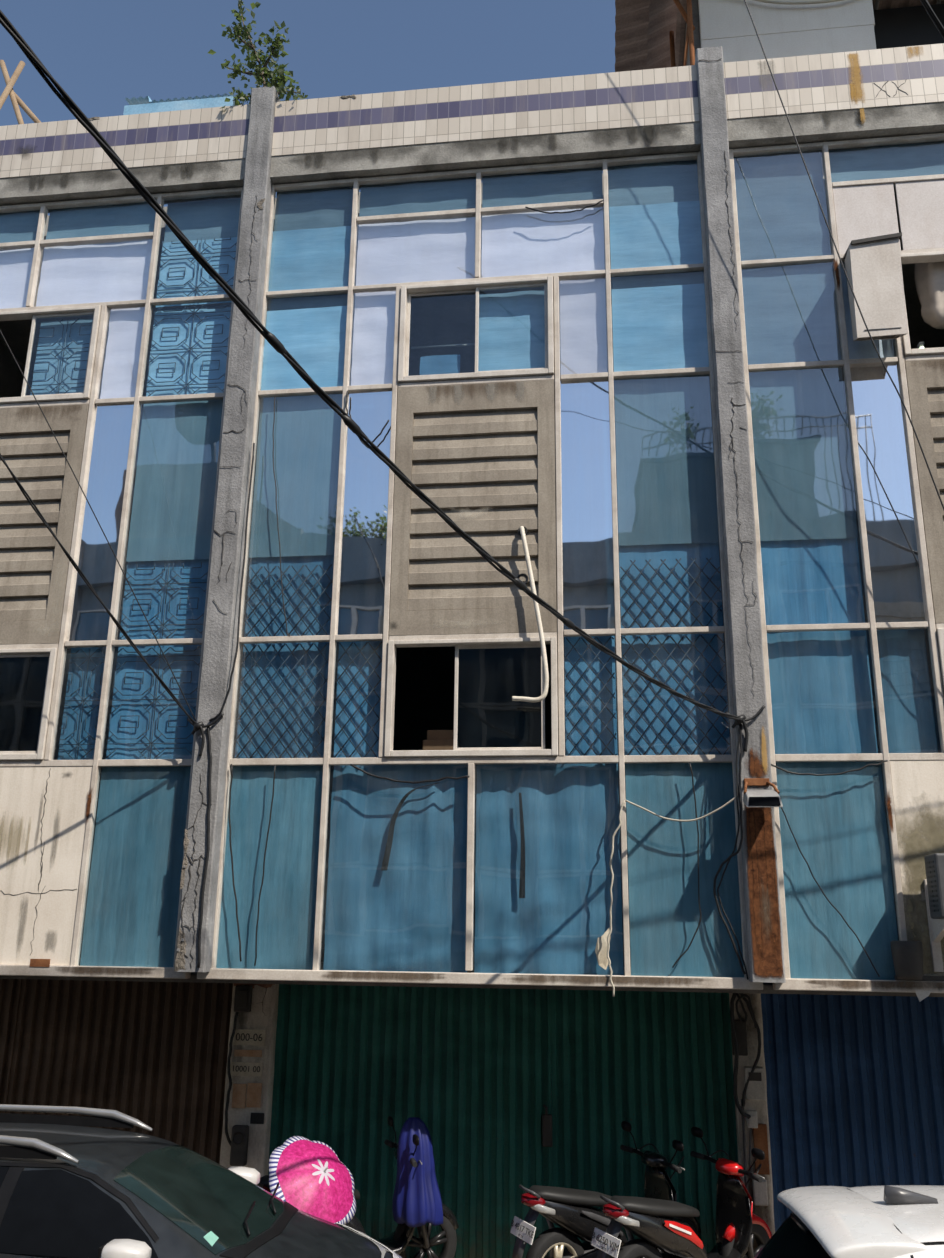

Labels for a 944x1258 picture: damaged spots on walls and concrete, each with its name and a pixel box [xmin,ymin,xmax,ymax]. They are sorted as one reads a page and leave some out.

crack [719,151,739,352]
crack [223,384,247,433]
crack [213,509,237,614]
crack [728,381,757,691]
leakage [18,903,27,945]
leakage [0,801,58,857]
crack [1,768,76,955]
spalling [174,927,187,972]
spalling [179,829,190,890]
crack [178,773,212,968]
corrosion [746,807,784,977]
leakage [809,811,944,990]